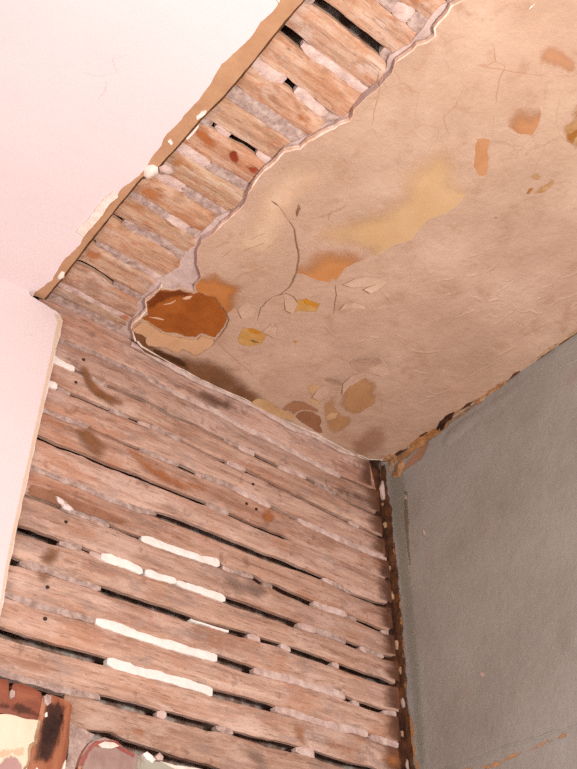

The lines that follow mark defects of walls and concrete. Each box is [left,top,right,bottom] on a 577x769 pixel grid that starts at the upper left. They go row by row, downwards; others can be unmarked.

spalling [381,0,466,82]
crack [478,44,549,101]
spalling [77,191,118,237]
spalling [116,89,429,478]
water stain [243,176,311,250]
crack [257,201,345,321]
water stain [331,160,466,254]
peeling [297,48,577,294]
crack [369,329,577,769]
peeling [79,740,199,769]